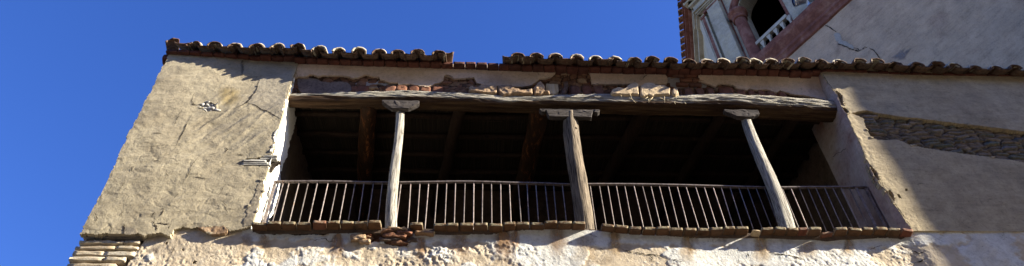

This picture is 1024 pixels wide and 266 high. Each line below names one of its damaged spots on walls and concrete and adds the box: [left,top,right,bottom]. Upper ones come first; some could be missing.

peeling [297,77,369,94]
peeling [384,78,550,97]
peeling [560,72,787,104]
flaking render [67,240,142,266]